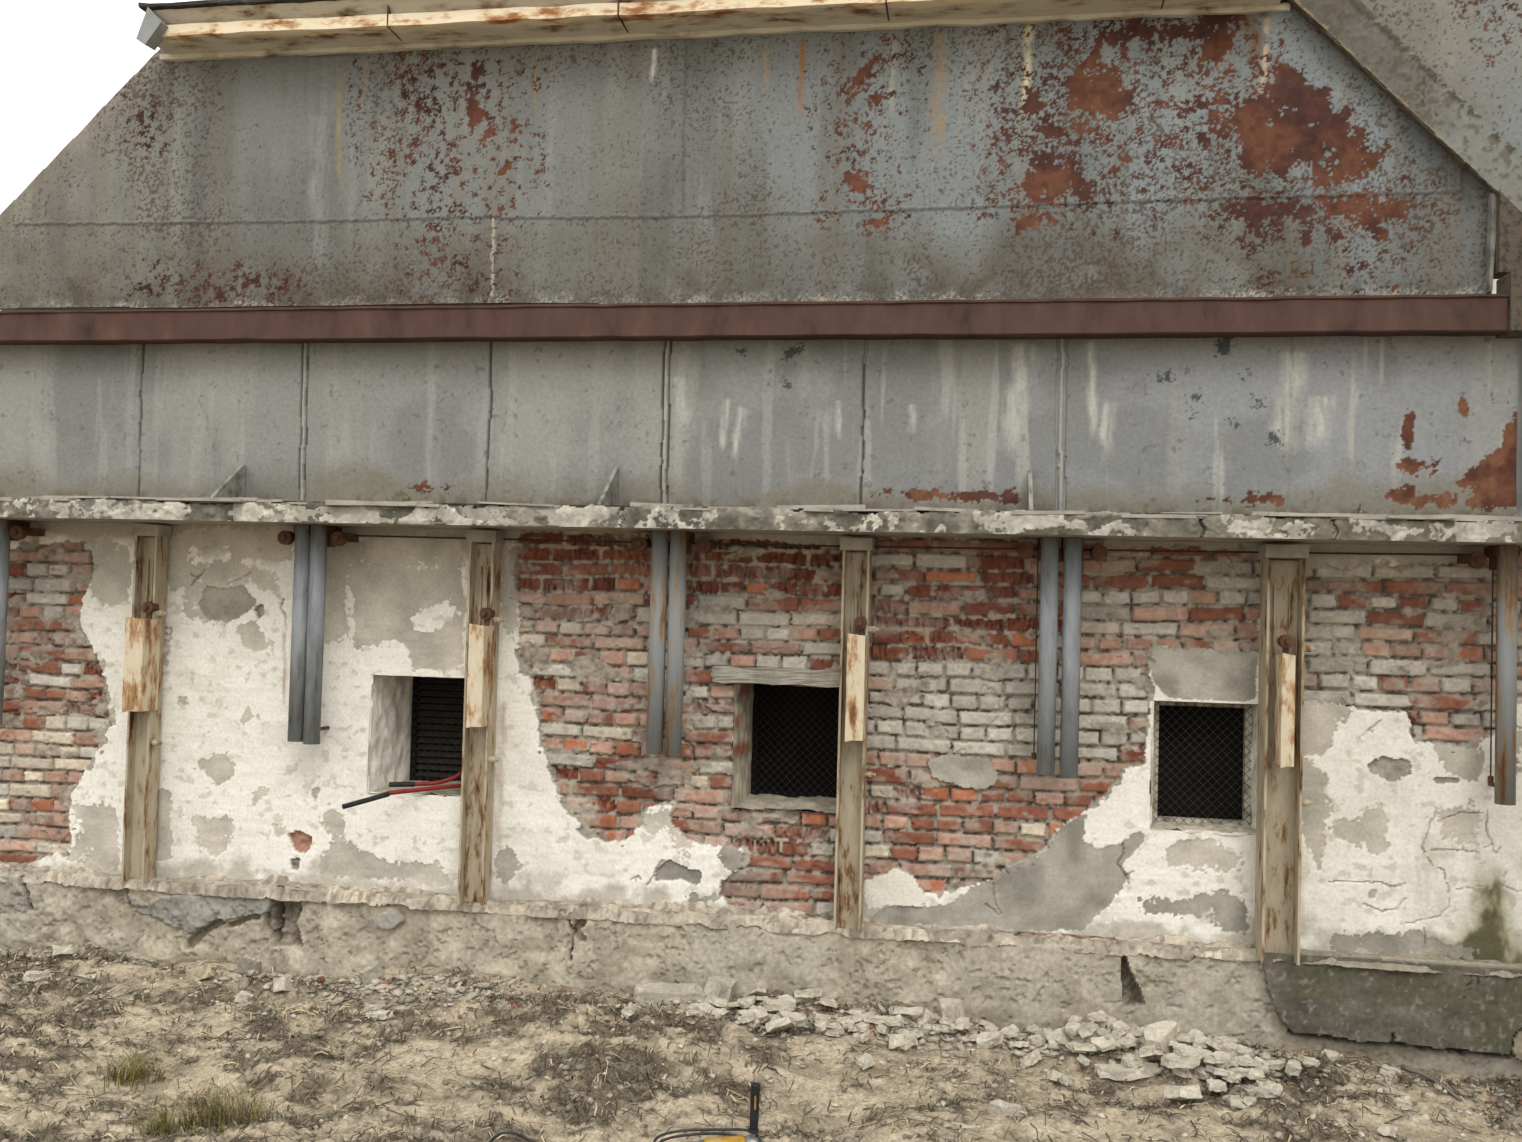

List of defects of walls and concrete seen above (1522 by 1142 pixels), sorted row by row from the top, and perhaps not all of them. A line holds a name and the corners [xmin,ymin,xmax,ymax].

corrosion [1449,0,1522,70]
corrosion [110,69,179,164]
corrosion [349,44,556,304]
corrosion [795,32,929,236]
corrosion [959,7,1457,296]
corrosion [121,258,315,307]
corrosion [1385,400,1517,512]
spalling [0,497,1320,945]
crack [1362,710,1419,744]
spalling [1302,519,1522,870]
crack [1328,808,1522,944]
crack [1316,1027,1521,1058]